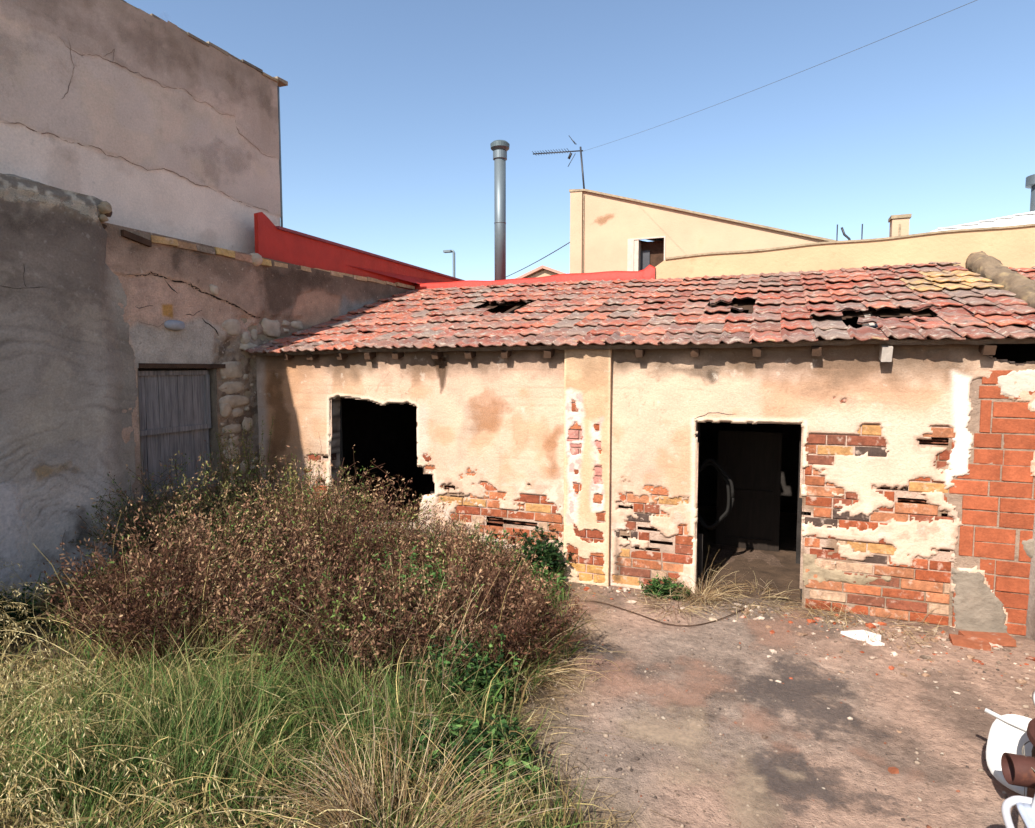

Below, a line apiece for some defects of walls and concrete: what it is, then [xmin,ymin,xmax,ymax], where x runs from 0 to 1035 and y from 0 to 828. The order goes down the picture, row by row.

crack [59,37,269,157]
crack [13,122,265,210]
crack [127,271,260,334]
spalling [427,400,693,586]
spalling [801,425,955,626]